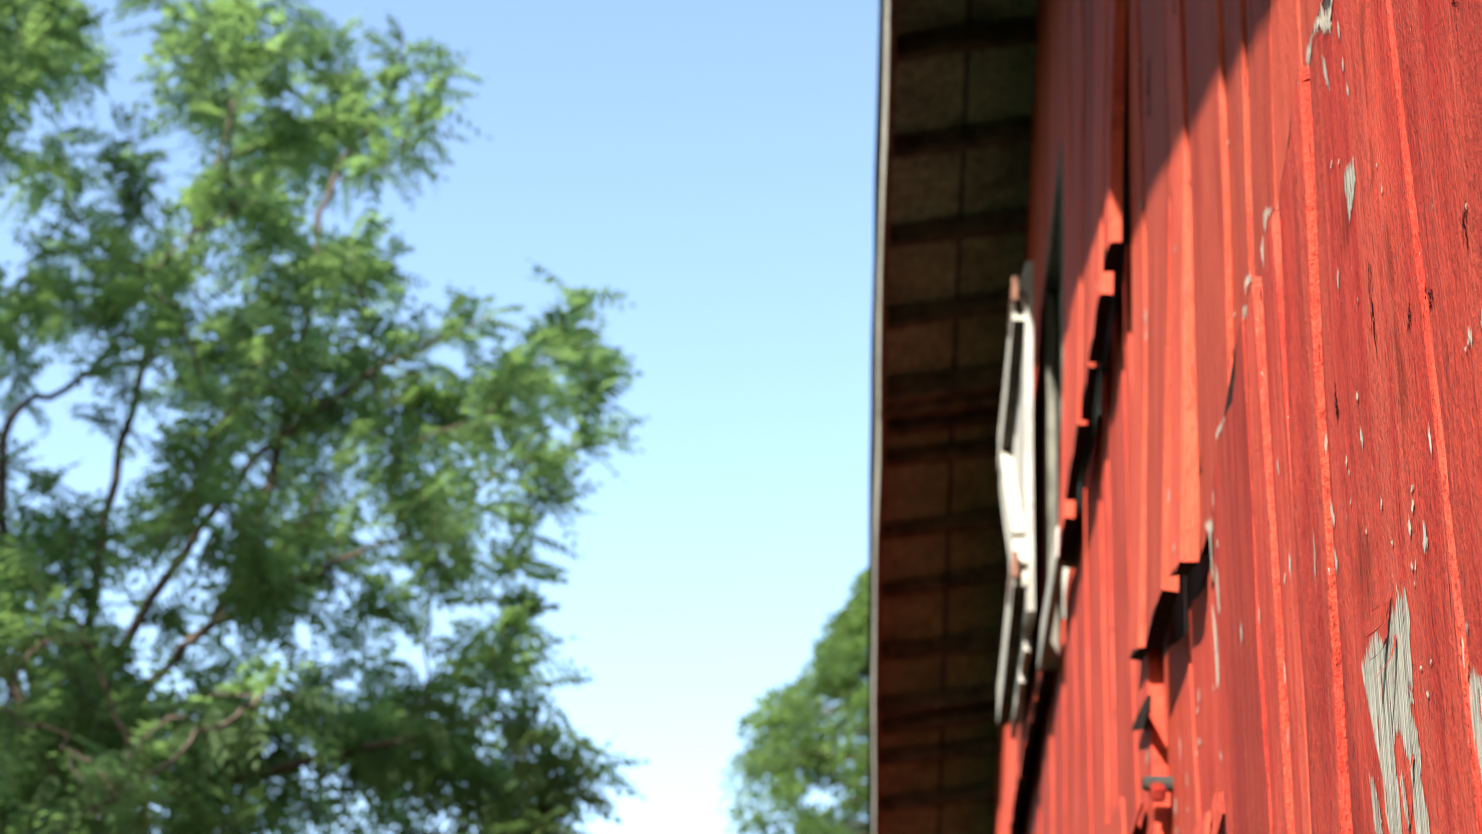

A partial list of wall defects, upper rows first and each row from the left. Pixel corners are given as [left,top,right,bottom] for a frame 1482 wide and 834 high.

spalling [1314,0,1332,35]
peeling [1331,158,1356,224]
peeling [1361,484,1432,834]
peeling [1462,622,1482,780]